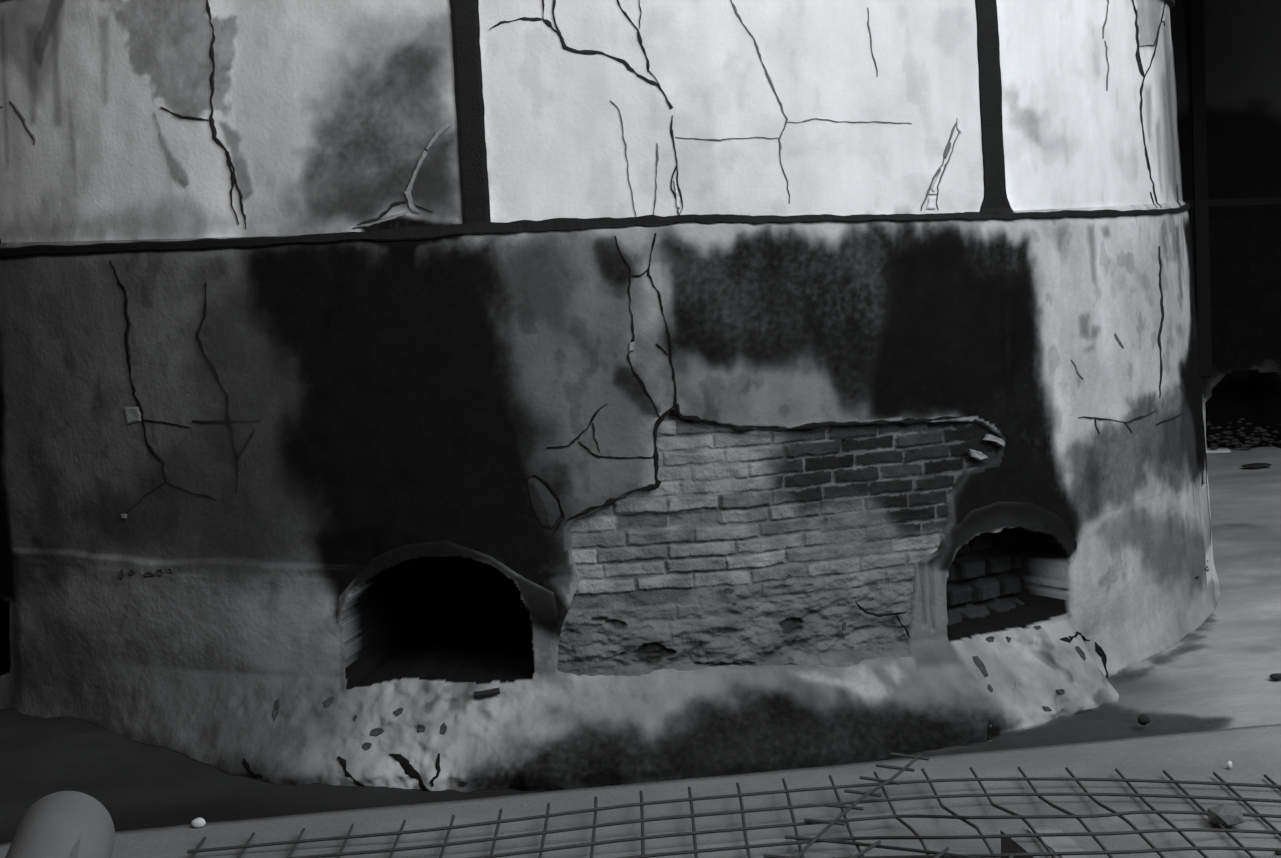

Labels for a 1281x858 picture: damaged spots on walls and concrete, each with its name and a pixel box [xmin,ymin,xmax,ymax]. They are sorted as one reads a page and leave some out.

crack [160,0,246,229]
damp [307,46,455,221]
crack [1102,0,1181,208]
crack [110,260,260,518]
crack [489,0,962,520]
crack [1079,246,1183,434]
spalling [557,410,1005,676]